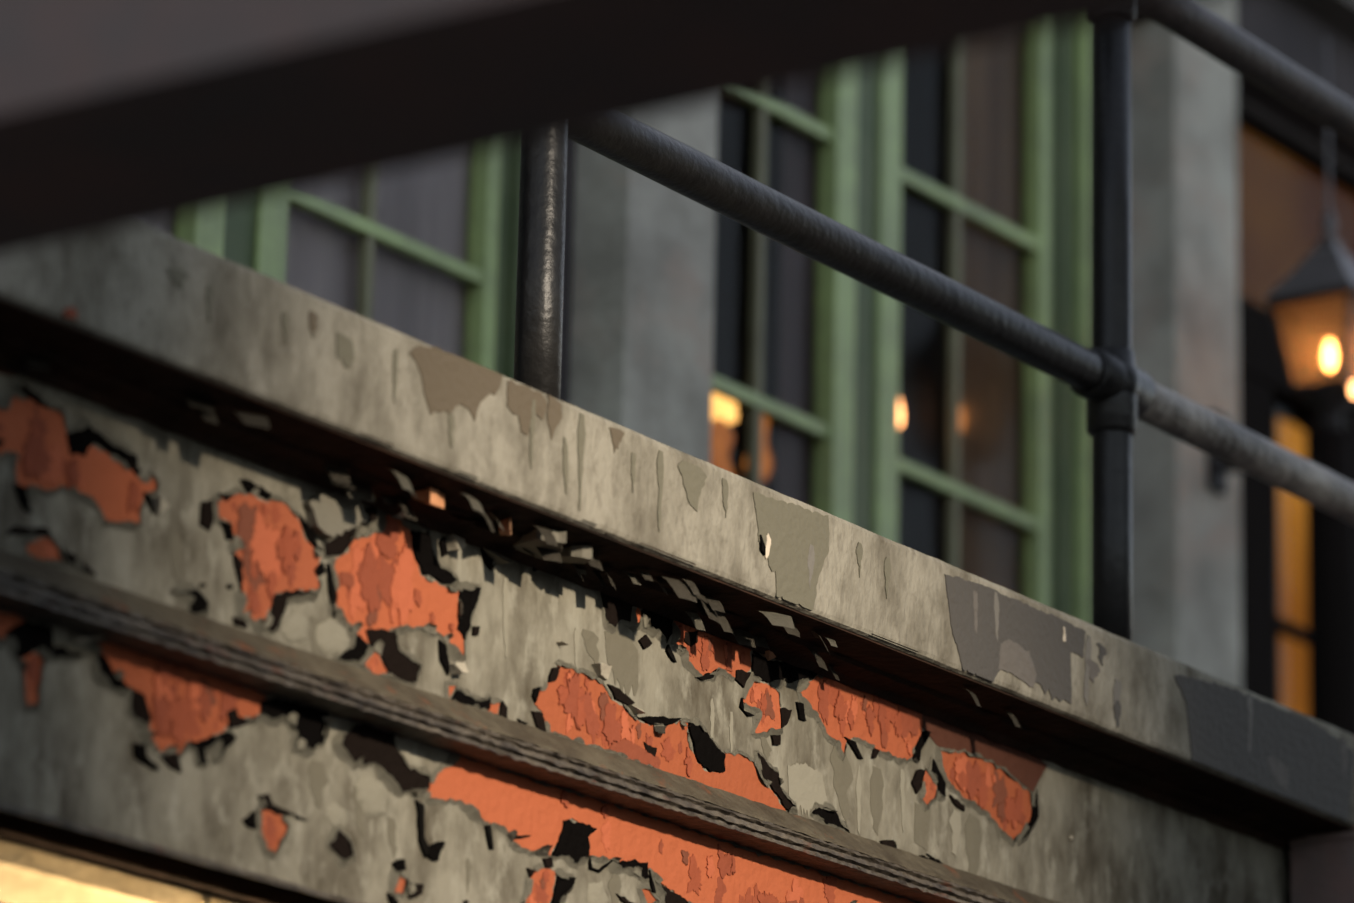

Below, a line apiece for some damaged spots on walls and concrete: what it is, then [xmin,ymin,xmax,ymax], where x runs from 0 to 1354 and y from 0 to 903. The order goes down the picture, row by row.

spalling [179,583,209,613]
peeling [0,611,915,903]
peeling [199,466,1047,843]